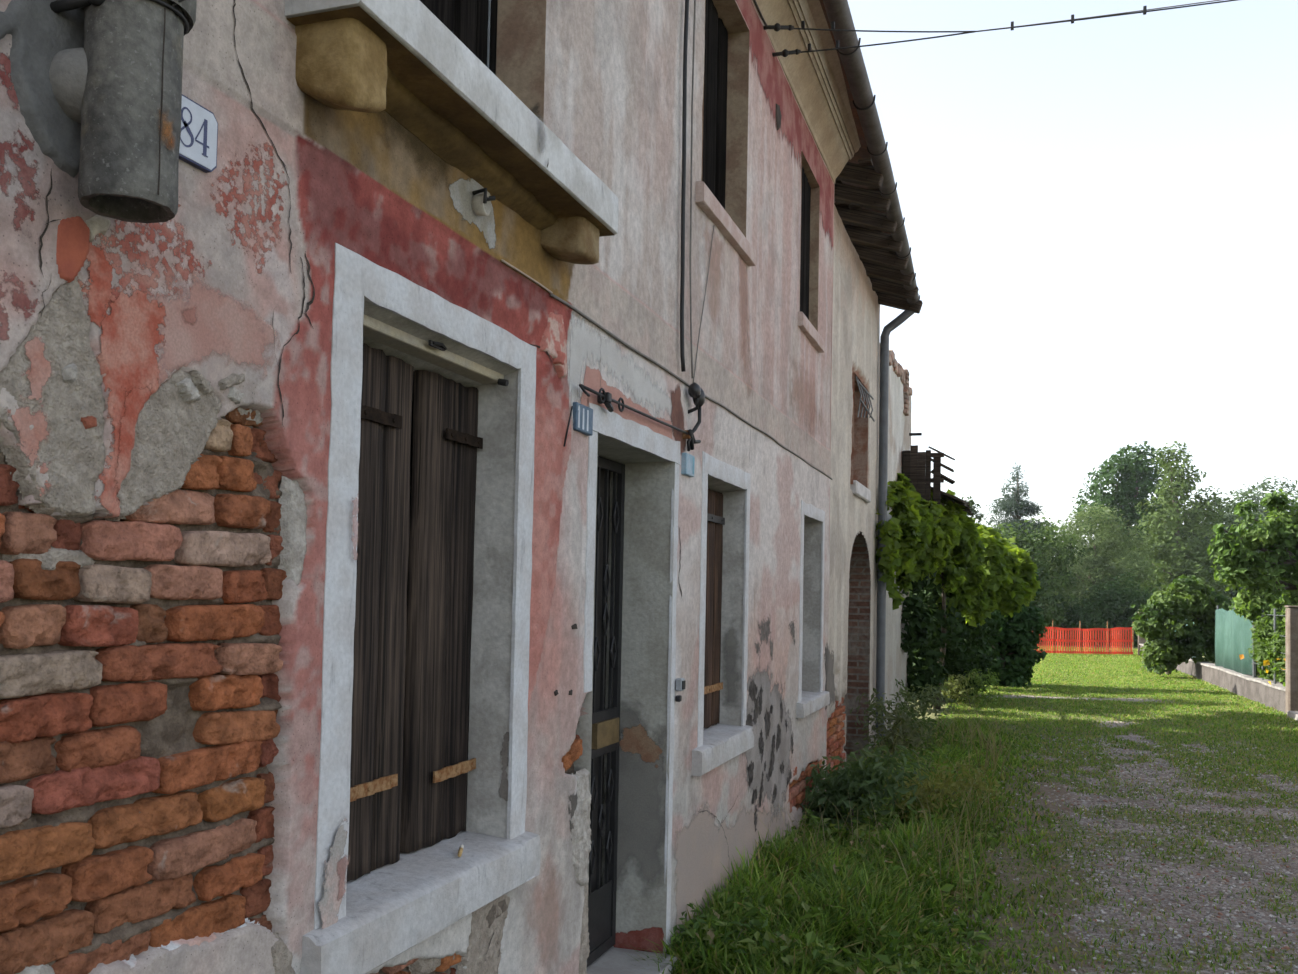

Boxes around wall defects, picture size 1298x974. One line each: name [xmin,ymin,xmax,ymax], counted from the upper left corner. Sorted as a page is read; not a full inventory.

peeling [0,53,19,109]
peeling [0,129,39,231]
crack [39,168,61,316]
peeling [210,142,288,274]
crack [233,0,315,429]
peeling [449,178,496,249]
flaking render [0,204,307,974]
flaking render [499,732,509,801]
flaking render [745,615,846,832]
peeling [318,818,349,929]
flaking render [370,894,510,974]
spalling [570,768,592,974]